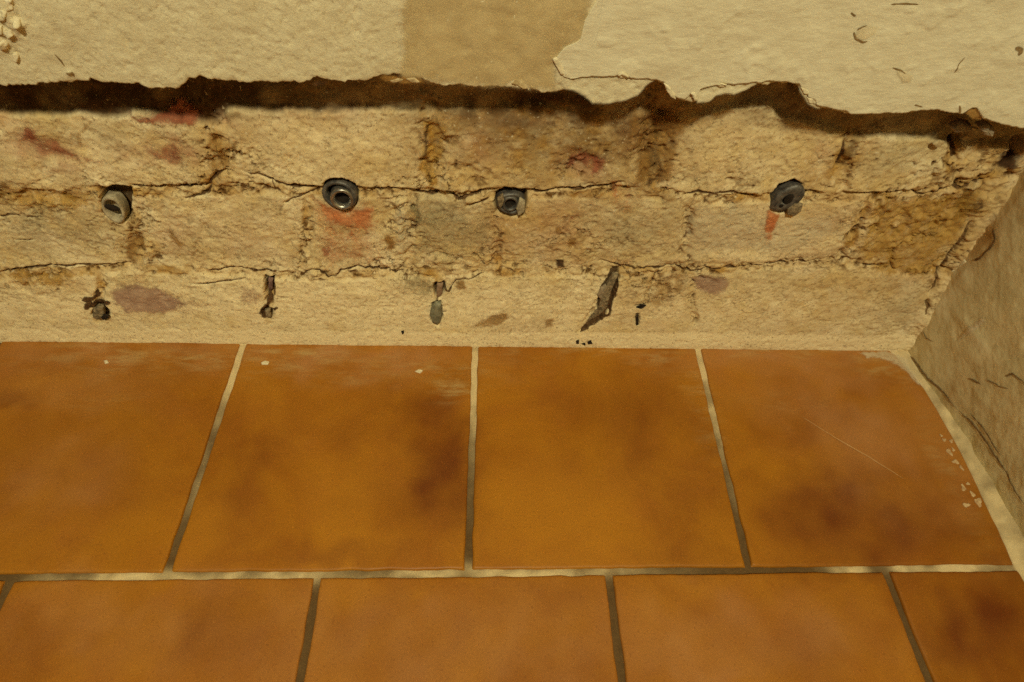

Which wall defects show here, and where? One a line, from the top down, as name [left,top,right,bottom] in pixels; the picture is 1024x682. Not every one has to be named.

crack [132,169,318,202]
crack [375,186,490,204]
crack [533,181,618,192]
crack [688,189,756,197]
flaking render [0,57,1024,352]
corrosion [765,211,779,239]
crack [2,261,128,271]
crack [190,266,256,284]
crack [301,265,428,277]
crack [606,259,815,281]